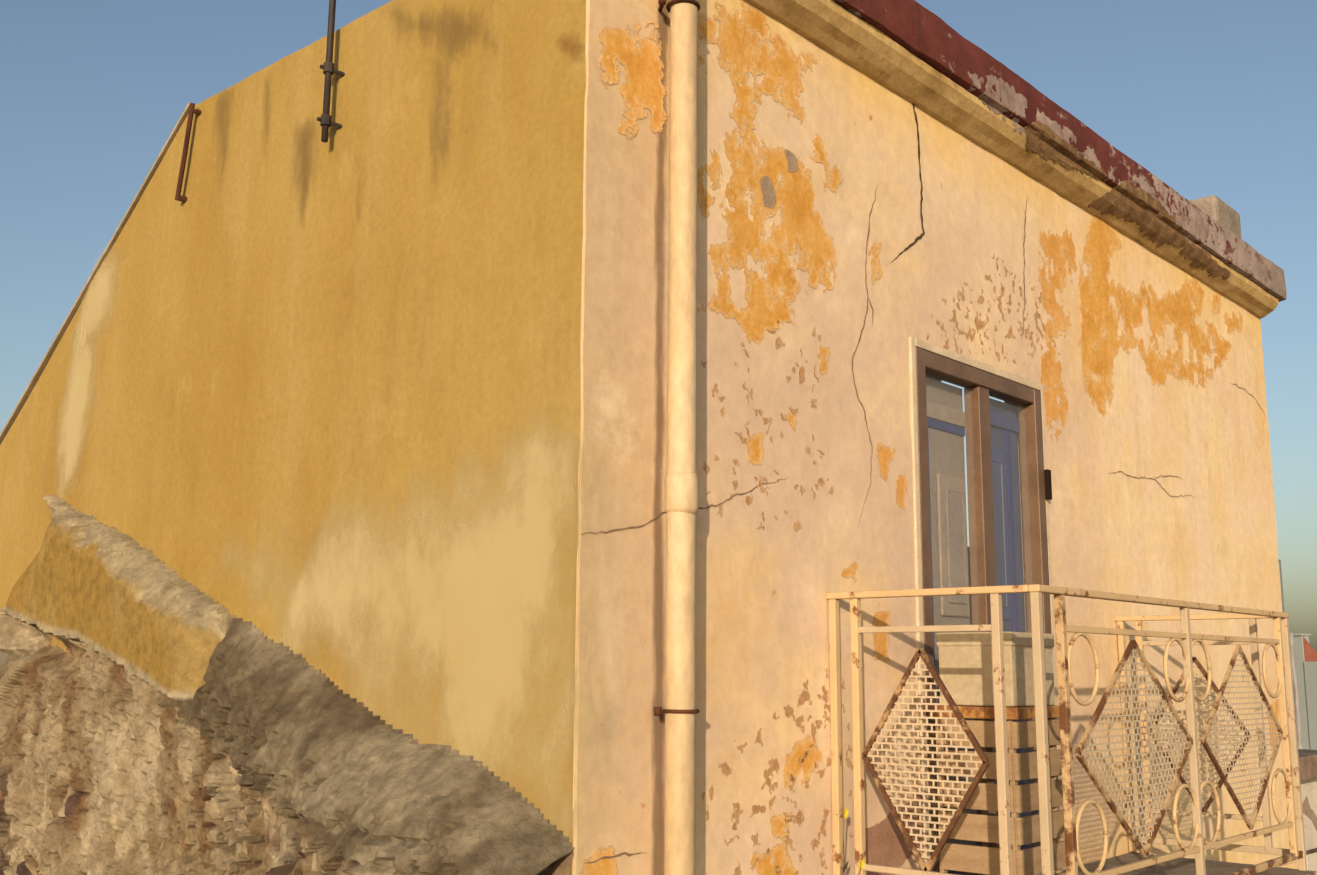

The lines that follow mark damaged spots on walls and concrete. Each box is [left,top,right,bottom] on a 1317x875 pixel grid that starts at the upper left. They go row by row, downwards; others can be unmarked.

peeling [697,0,843,344]
peeling [967,71,1243,442]
crack [852,103,925,526]
peeling [818,346,830,375]
peeling [747,432,764,465]
crack [699,478,787,509]
peeling [876,442,907,510]
crack [578,512,666,535]
peeling [872,611,890,663]
peeling [783,735,822,789]
peeling [579,845,618,875]
peeling [750,812,799,875]